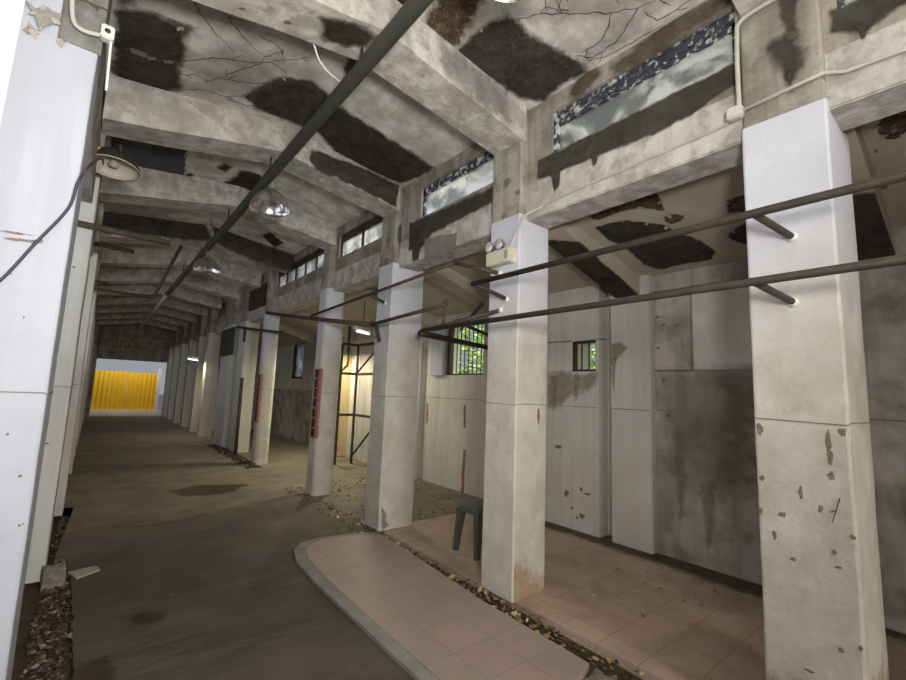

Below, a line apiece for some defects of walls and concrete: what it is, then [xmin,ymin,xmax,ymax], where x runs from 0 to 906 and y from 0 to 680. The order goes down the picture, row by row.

peeling [23,1,61,39]
spalling [110,10,186,92]
crack [183,0,311,110]
spalling [427,0,586,101]
crack [517,0,690,62]
damp [767,0,804,87]
spalling [111,136,188,175]
spalling [244,77,328,127]
spalling [317,108,434,183]
peeling [872,111,906,153]
spalling [588,193,715,269]
spalling [825,428,846,480]